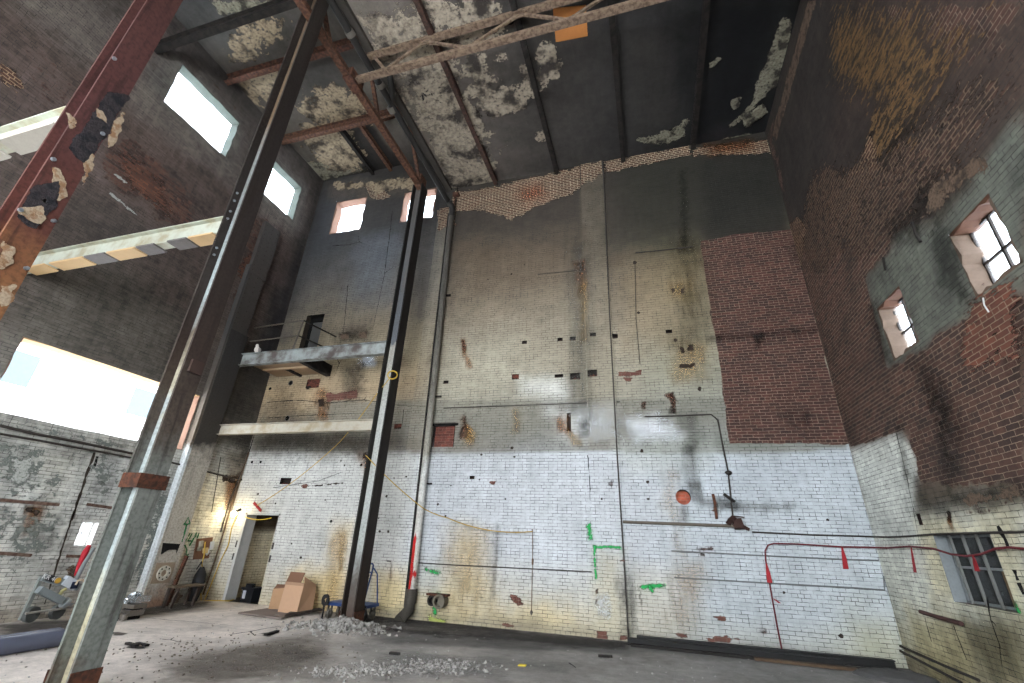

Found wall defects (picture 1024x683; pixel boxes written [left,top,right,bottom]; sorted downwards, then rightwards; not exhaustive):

peeling [17,167,68,229]
peeling [66,91,173,220]
flaking render [356,0,816,231]
spalling [801,0,1021,279]
peeling [0,241,16,269]
peeling [0,284,17,307]
spalling [959,277,1024,374]
peeling [0,443,70,585]
peeling [0,420,126,512]
crack [44,452,99,604]
corrosion [459,415,474,440]